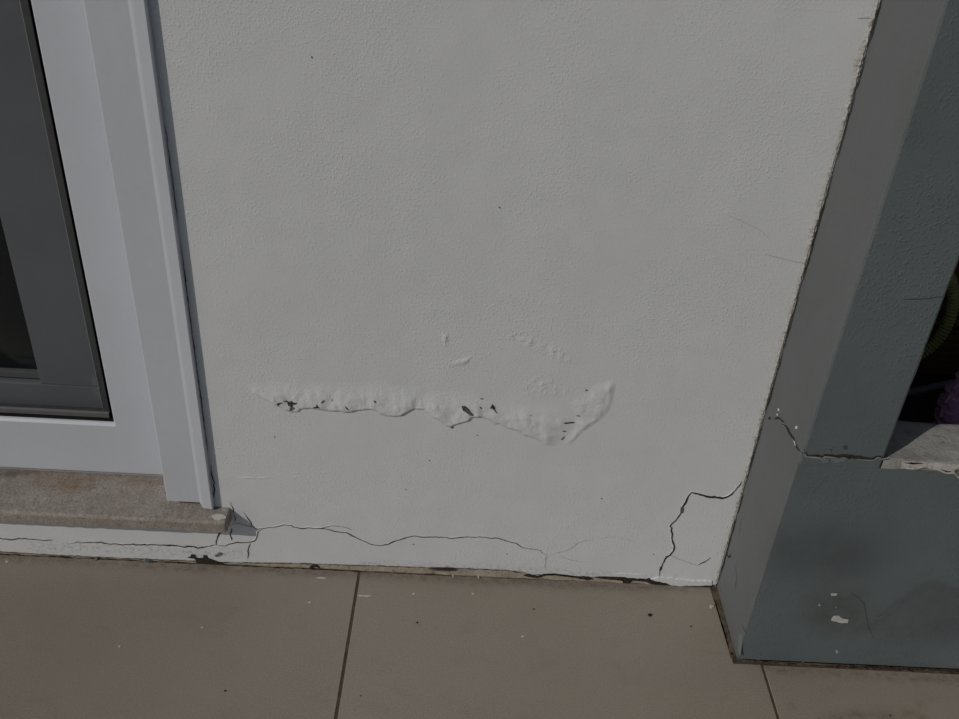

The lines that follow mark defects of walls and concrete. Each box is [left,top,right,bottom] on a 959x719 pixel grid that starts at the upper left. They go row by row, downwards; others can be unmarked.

crack [0,249,630,581]
crack [768,417,888,461]
spalling [901,460,959,478]
crack [609,482,742,586]